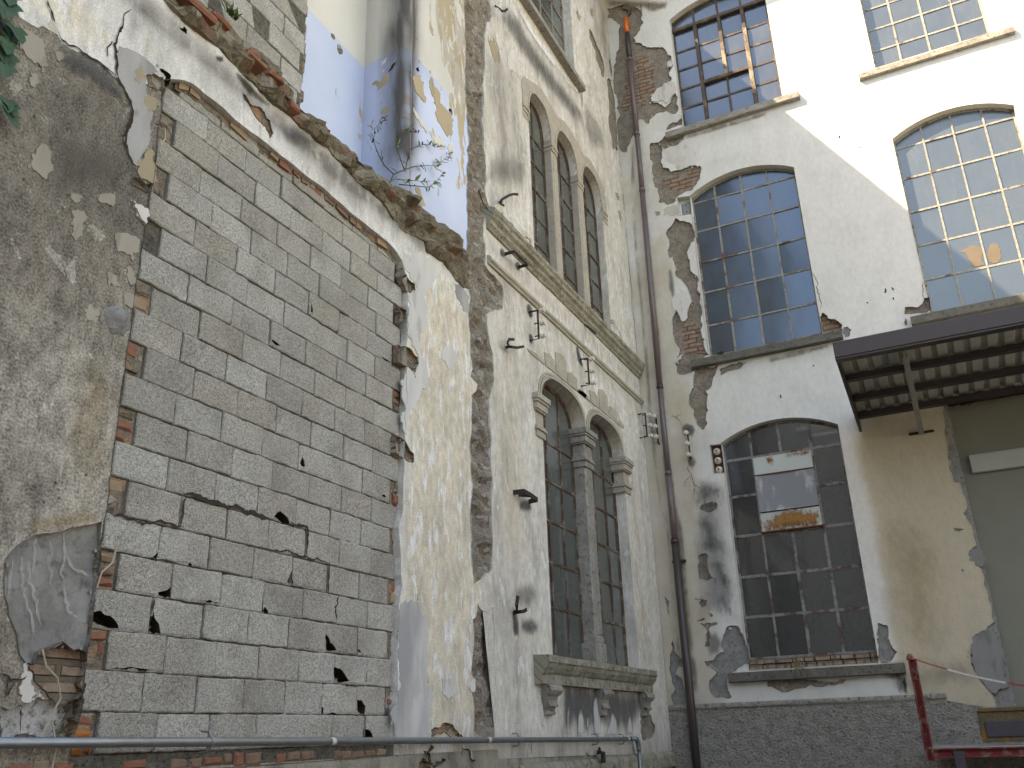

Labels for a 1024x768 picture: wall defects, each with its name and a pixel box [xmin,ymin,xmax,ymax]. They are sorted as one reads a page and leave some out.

crack [47,0,138,175]
peeling [410,71,461,172]
peeling [115,46,438,463]
peeling [455,284,469,312]
spalling [576,4,747,429]
crack [107,492,339,619]
spalling [0,477,463,768]
water stain [565,688,640,735]
spalling [669,641,686,704]
spalling [697,599,897,699]
peeling [967,629,1009,695]